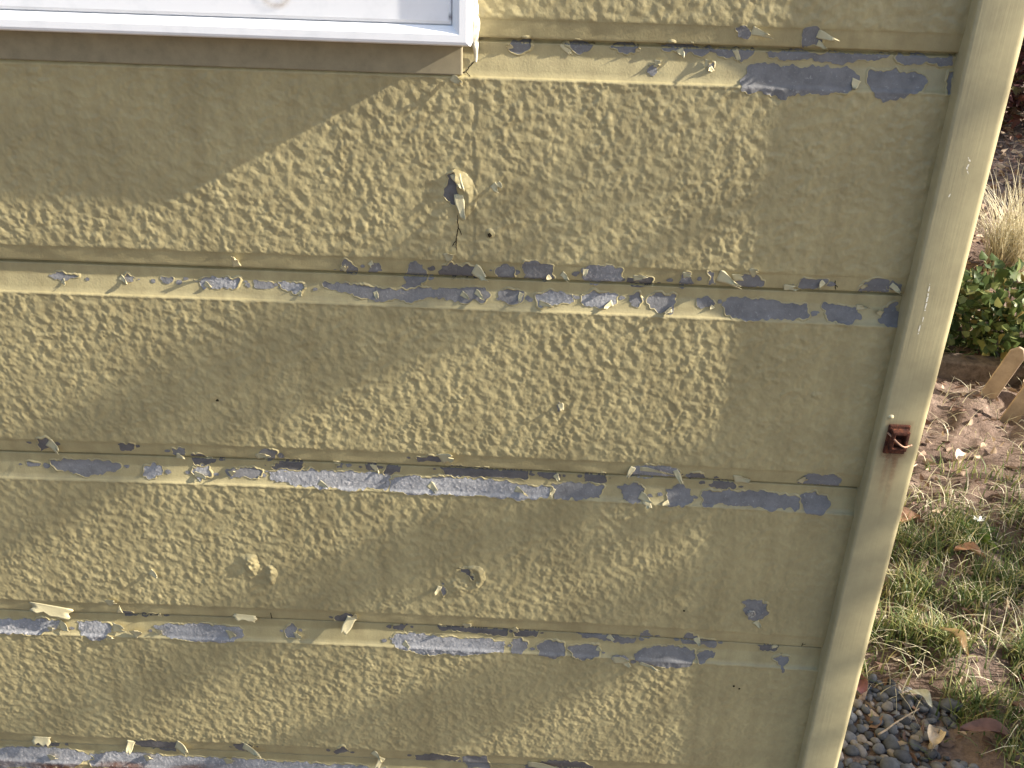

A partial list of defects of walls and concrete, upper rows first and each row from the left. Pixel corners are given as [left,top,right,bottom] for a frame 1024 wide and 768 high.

peeling [506,35,534,57]
peeling [560,38,595,55]
peeling [646,25,954,103]
peeling [442,170,465,220]
peeling [119,256,902,328]
peeling [19,435,140,478]
peeling [164,446,843,516]
peeling [0,600,257,643]
peeling [329,612,357,635]
peeling [382,624,723,672]
peeling [0,736,387,768]
peeling [407,752,492,768]